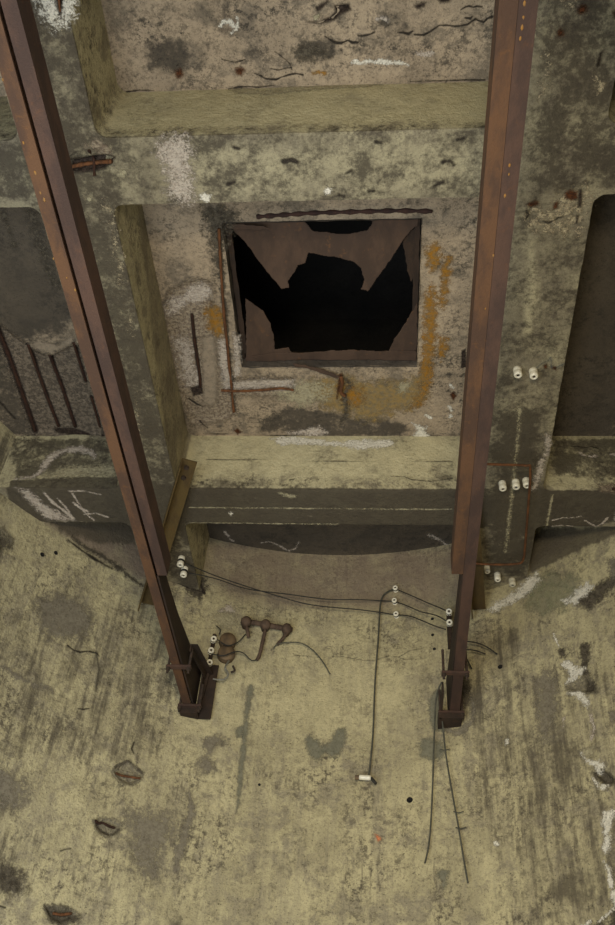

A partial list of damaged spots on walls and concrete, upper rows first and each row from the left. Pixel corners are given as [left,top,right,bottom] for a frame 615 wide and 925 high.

crack [222,32,375,90]
crack [397,5,493,36]
crack [417,76,485,84]
leakage [155,133,237,278]
spalling [0,324,105,437]
rust [272,241,453,424]
spalling [43,903,81,925]
spalling [92,817,123,838]
spalling [112,760,145,786]
leakage [236,685,253,809]
leakage [533,660,609,790]
leakage [585,809,615,925]